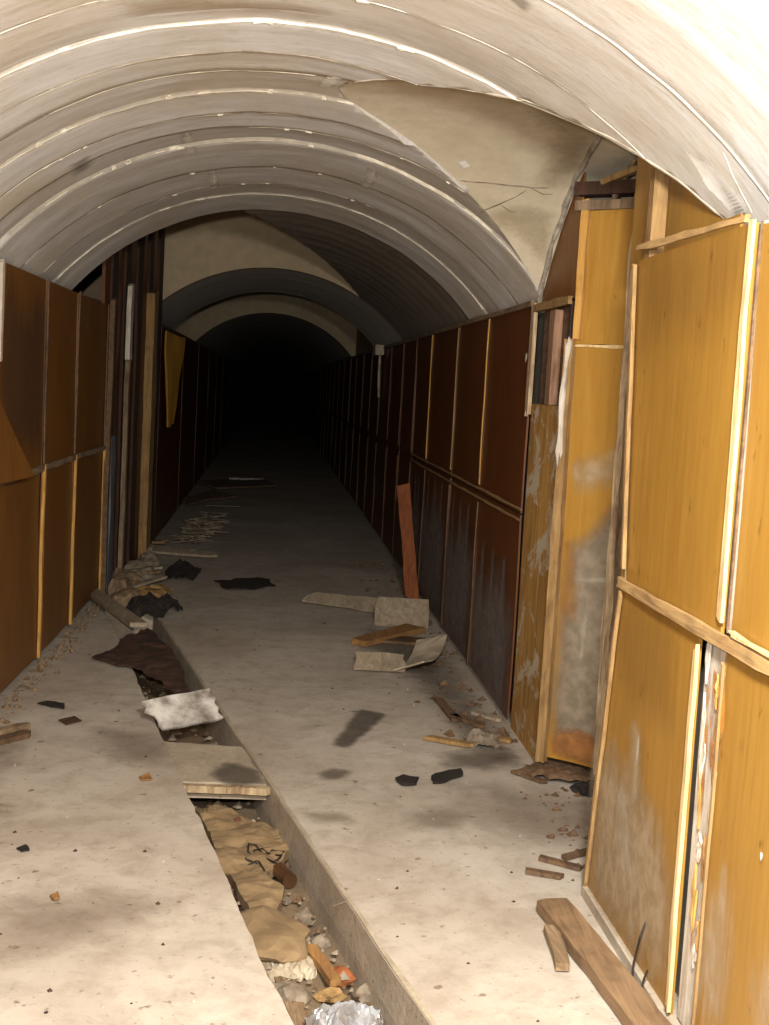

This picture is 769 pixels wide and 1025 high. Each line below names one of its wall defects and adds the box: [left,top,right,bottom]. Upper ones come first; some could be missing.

water stain [412,480,505,700]
water stain [556,518,620,740]
water stain [595,735,663,961]